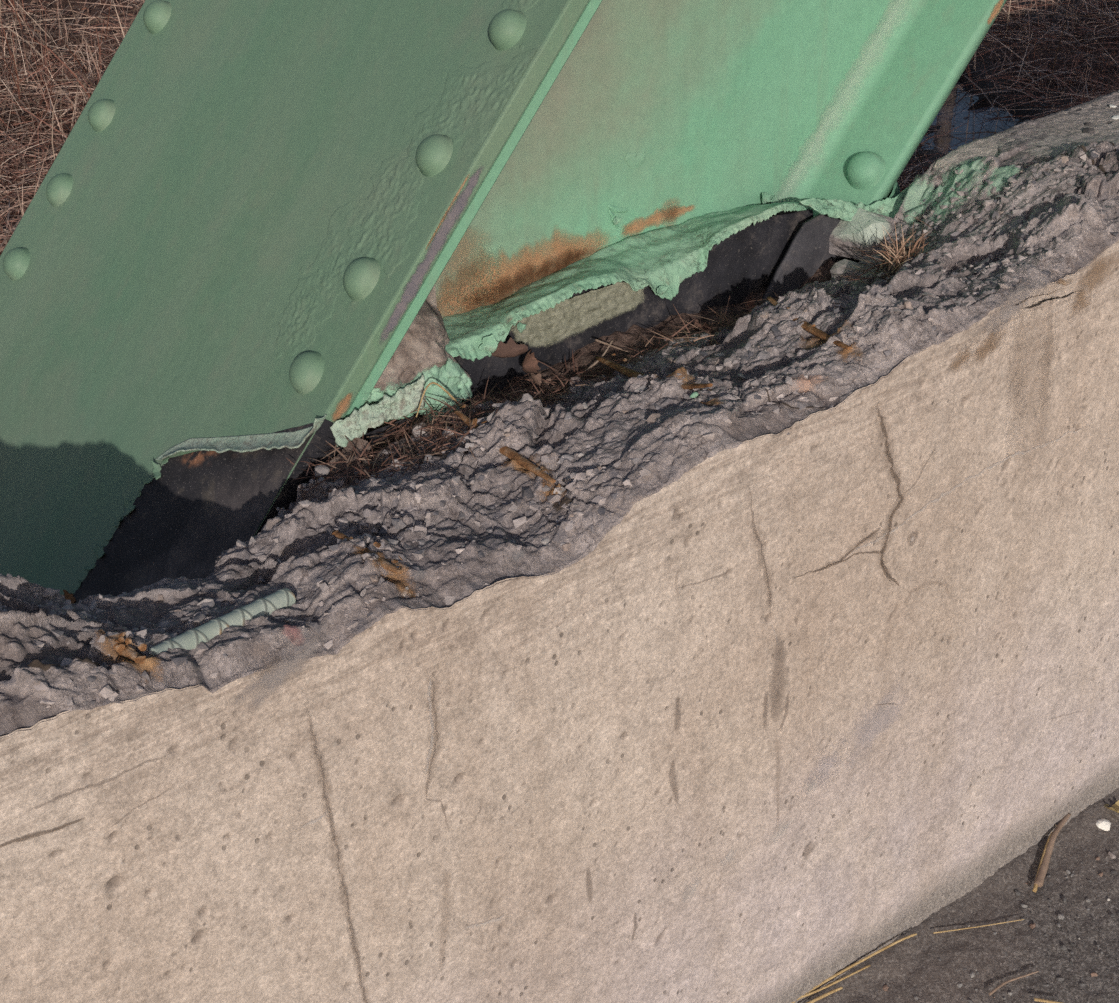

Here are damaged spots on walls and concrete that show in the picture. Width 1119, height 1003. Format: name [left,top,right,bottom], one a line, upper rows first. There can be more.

corrosion [437,235,602,316]
corrosion [624,206,693,234]
spalling [0,120,1119,739]
crack [799,417,904,585]